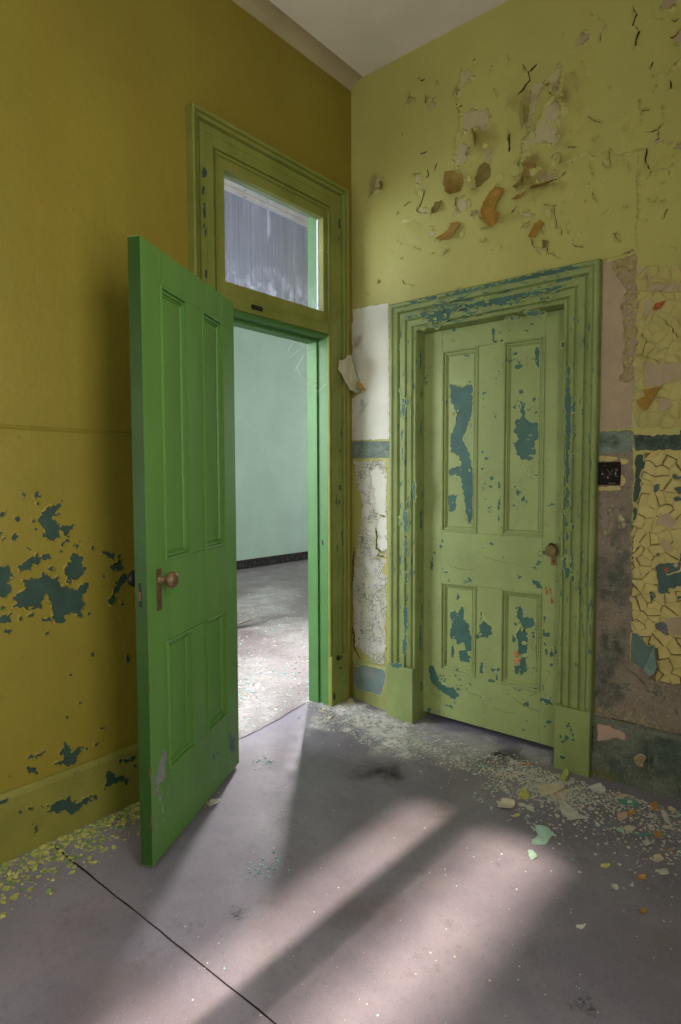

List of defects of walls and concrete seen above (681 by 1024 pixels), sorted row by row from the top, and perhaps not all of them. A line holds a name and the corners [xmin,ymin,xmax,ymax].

peeling [413,62,569,256]
crack [472,53,537,98]
crack [505,6,680,260]
peeling [404,264,581,344]
peeling [448,383,490,525]
peeling [512,389,539,462]
flaking render [594,249,681,741]
peeling [0,491,127,636]
peeling [449,593,500,683]
peeling [511,605,558,676]
peeling [26,725,106,776]
peeling [18,750,168,874]